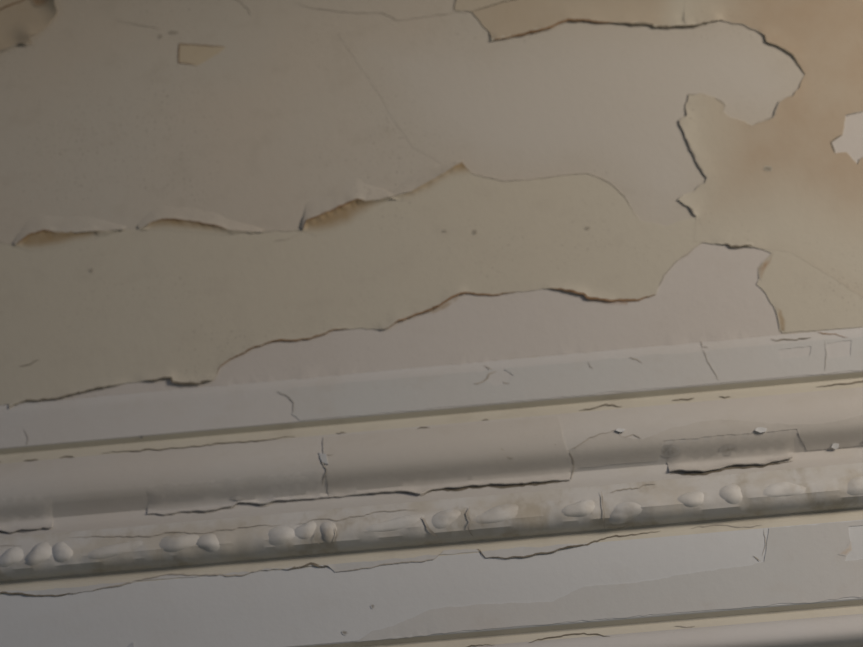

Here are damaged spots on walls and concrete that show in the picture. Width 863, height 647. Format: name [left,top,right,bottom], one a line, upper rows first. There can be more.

peeling [0,0,863,420]
crack [579,403,622,411]
crack [101,436,294,454]
crack [69,524,276,538]
peeling [0,531,659,596]
peeling [356,520,863,642]
crack [529,633,610,643]